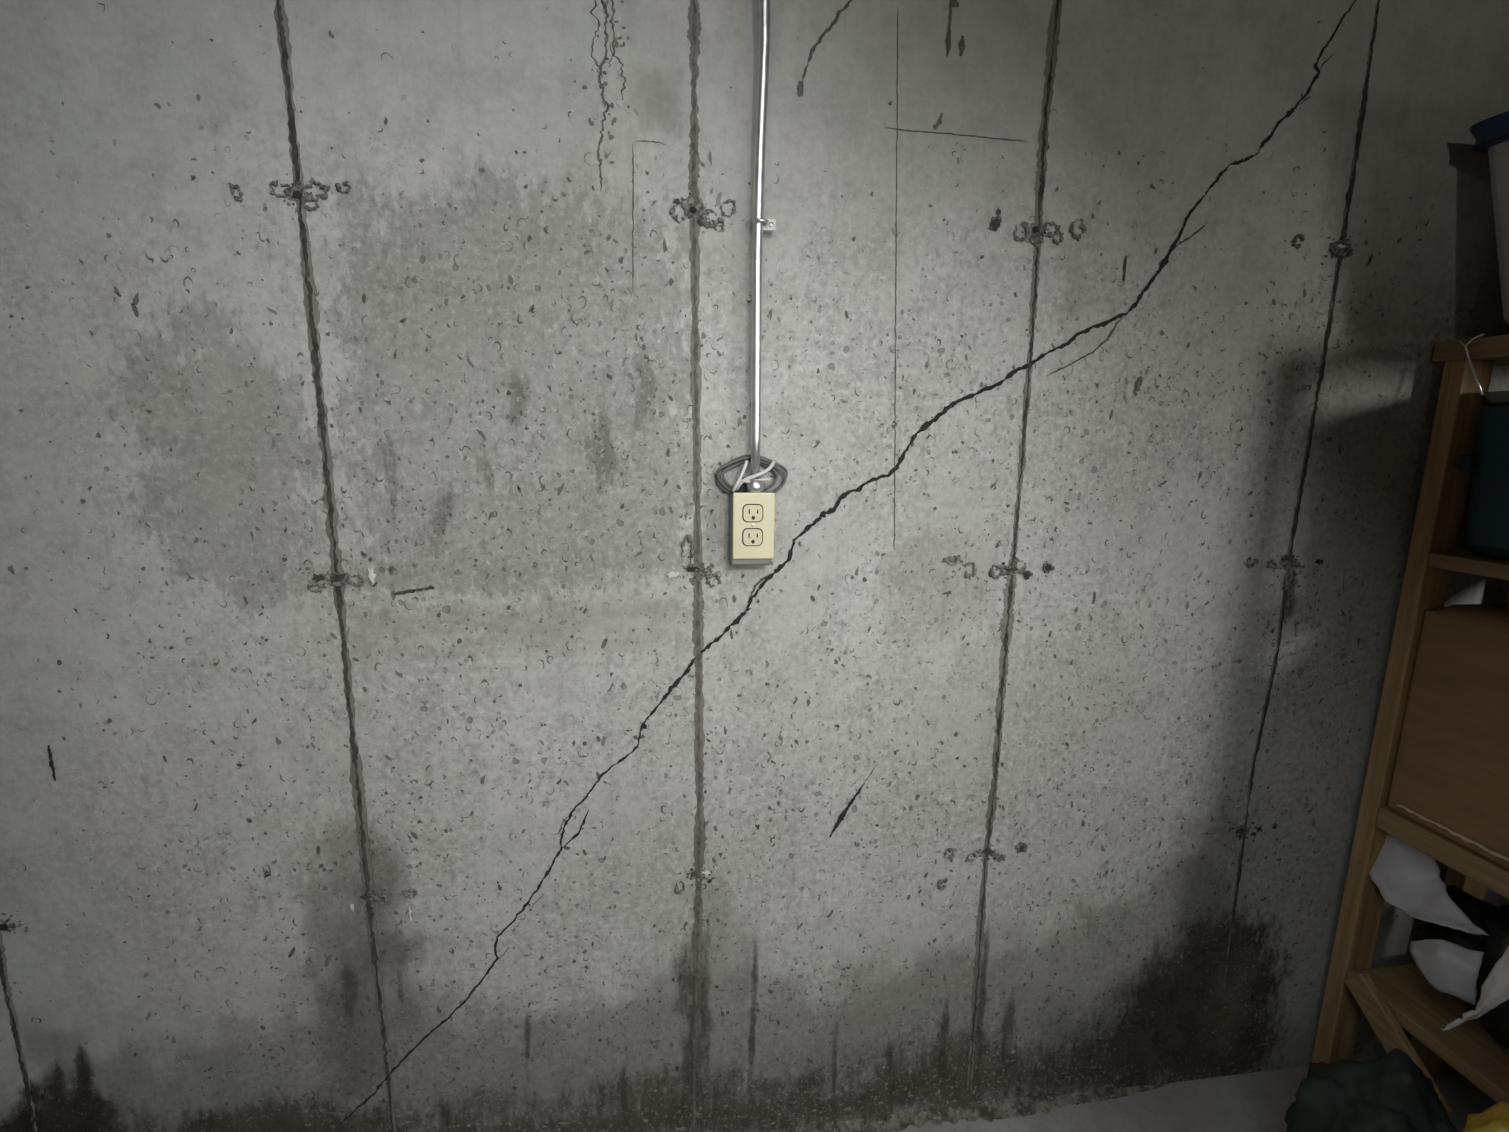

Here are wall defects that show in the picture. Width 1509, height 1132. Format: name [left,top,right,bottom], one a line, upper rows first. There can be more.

crack [333,0,1357,1130]
water stain [0,1048,128,1132]
water stain [187,915,1277,1132]